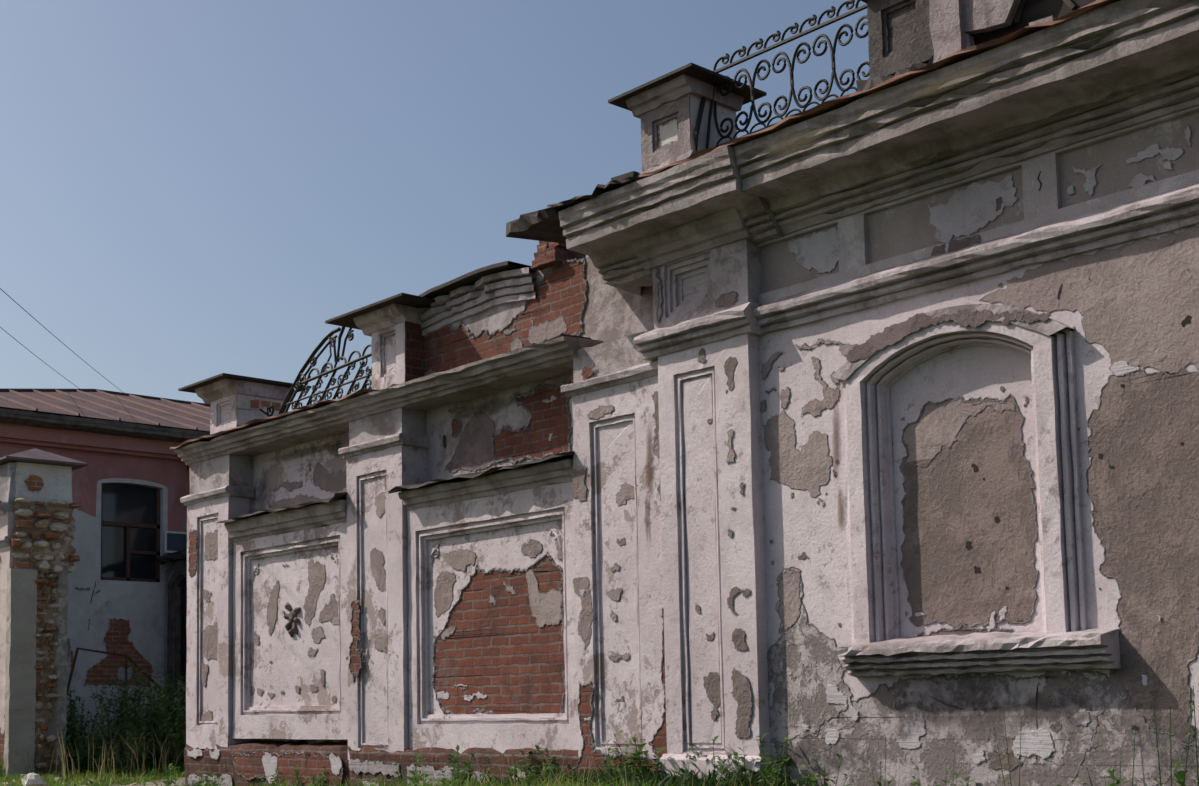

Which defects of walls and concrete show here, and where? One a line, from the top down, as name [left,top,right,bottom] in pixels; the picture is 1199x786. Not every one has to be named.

peeling [927,175,1018,256]
flaking render [424,257,588,376]
flaking render [443,364,593,474]
peeling [724,356,738,393]
peeling [760,225,1199,786]
spalling [9,473,154,774]
peeling [251,560,386,703]
peeling [370,547,386,592]
flaking render [432,539,667,777]
peeling [703,668,753,739]
peeling [727,586,750,651]
flaking render [187,749,490,786]